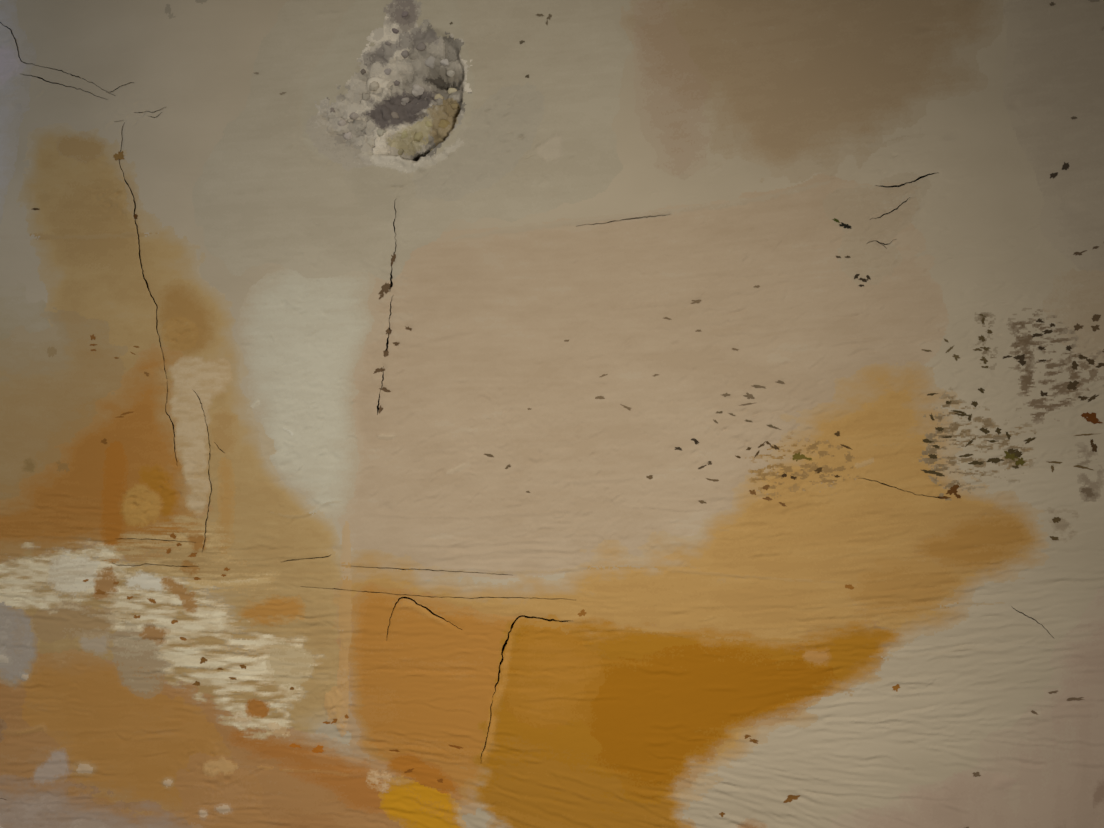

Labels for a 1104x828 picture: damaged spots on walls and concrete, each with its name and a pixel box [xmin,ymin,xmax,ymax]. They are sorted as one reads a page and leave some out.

hole [402,150,430,161]
hole [423,75,458,92]
crack [0,22,223,567]
water stain [0,123,343,734]
crack [373,202,412,415]
water stain [346,0,1104,815]
crack [301,566,571,756]